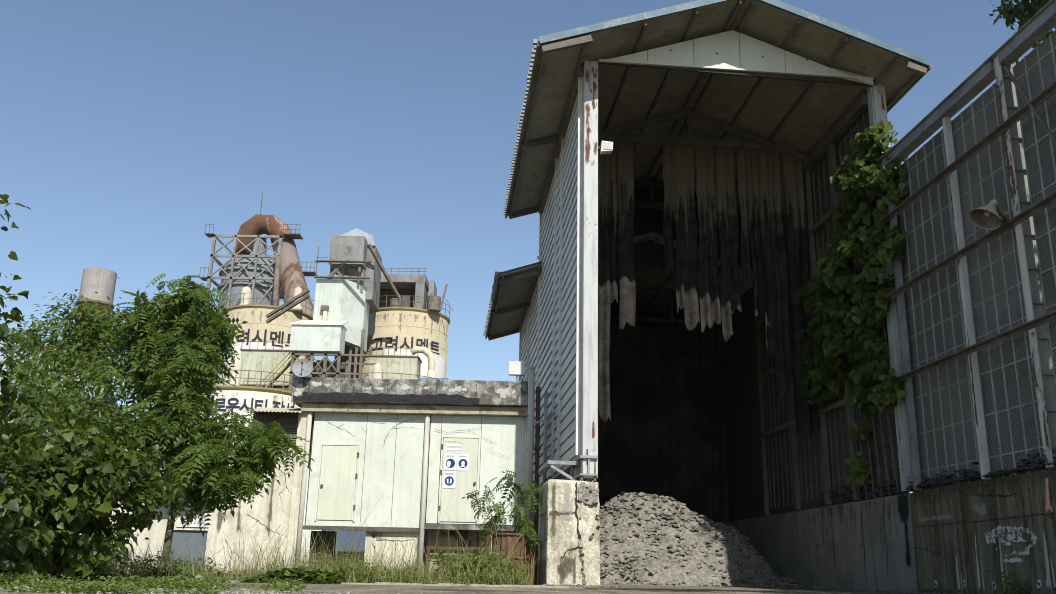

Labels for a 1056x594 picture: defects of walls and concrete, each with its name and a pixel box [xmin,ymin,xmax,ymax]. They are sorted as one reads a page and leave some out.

rust [585,67,597,162]
crack [540,482,588,590]
water stain [865,472,1056,592]